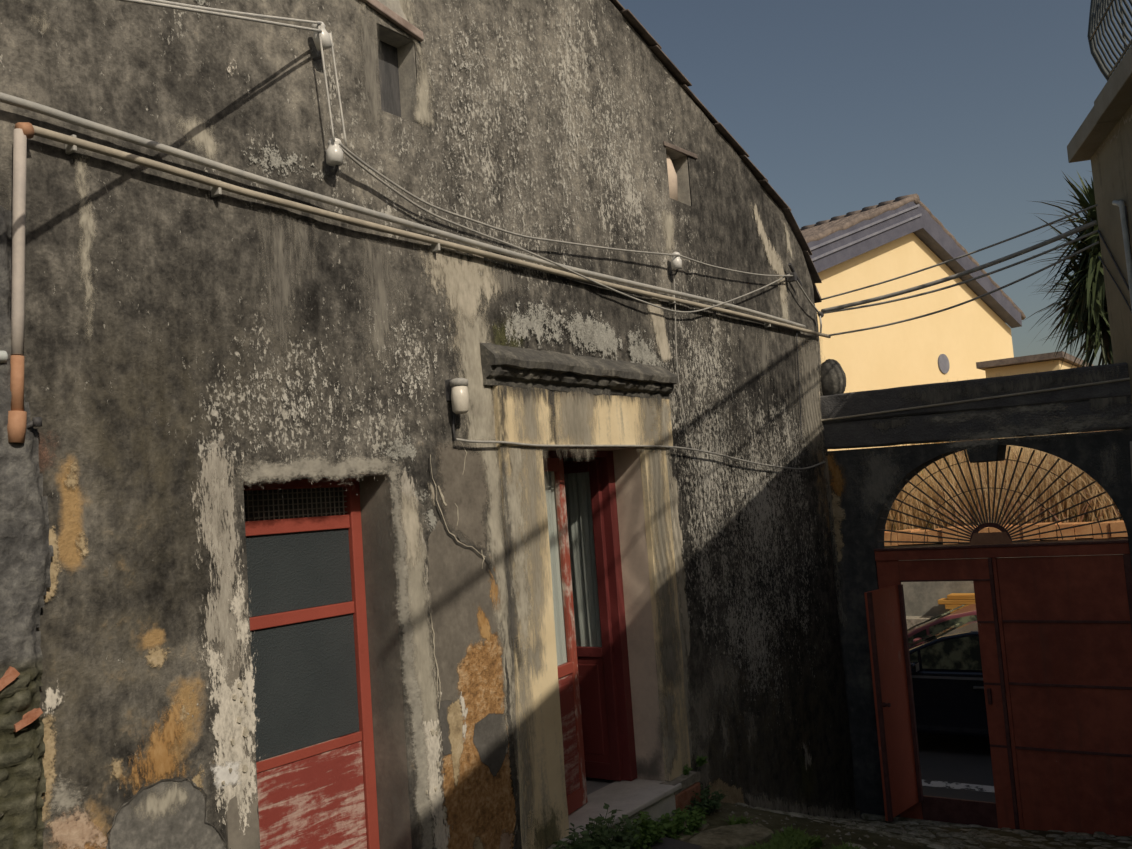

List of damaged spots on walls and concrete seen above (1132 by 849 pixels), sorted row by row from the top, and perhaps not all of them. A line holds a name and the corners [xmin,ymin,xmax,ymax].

leakage [77,156,95,334]
leakage [263,214,314,349]
leakage [364,240,401,368]
flaking render [43,526,61,602]
flaking render [191,304,521,849]
leakage [422,247,861,849]
flaking render [42,680,108,849]